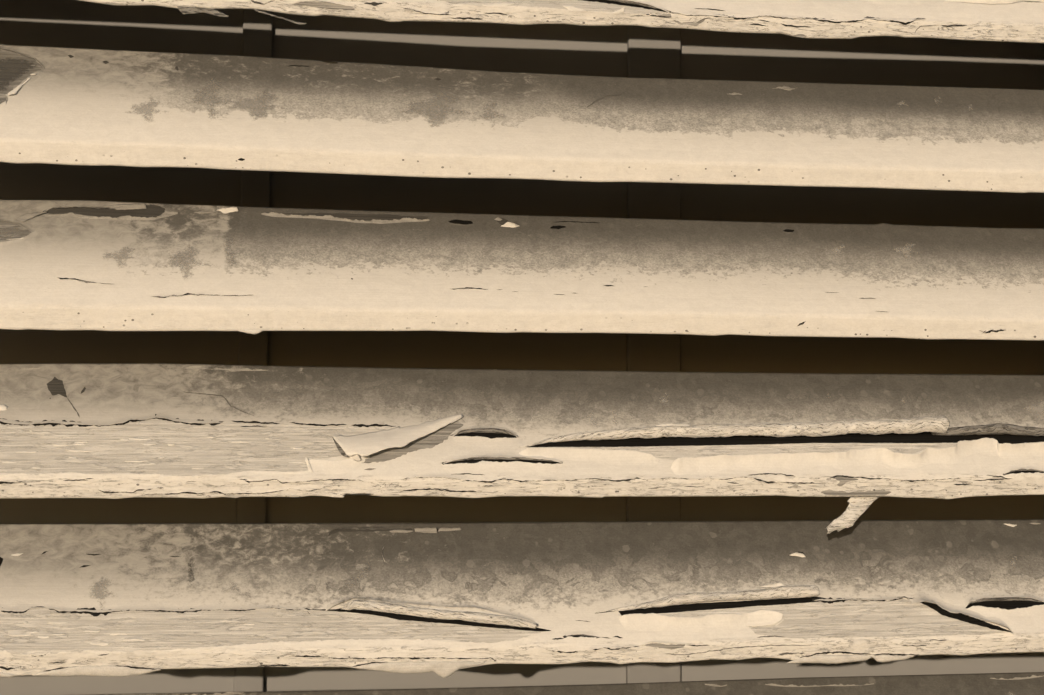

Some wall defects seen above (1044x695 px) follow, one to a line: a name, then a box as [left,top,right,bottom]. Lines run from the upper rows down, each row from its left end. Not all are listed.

peeling [293,0,383,10]
peeling [438,0,710,26]
peeling [0,46,45,109]
crack [0,391,393,427]
peeling [0,377,563,481]
crack [0,603,311,616]
peeling [0,594,541,661]
peeling [554,620,622,645]
peeling [912,589,1044,633]